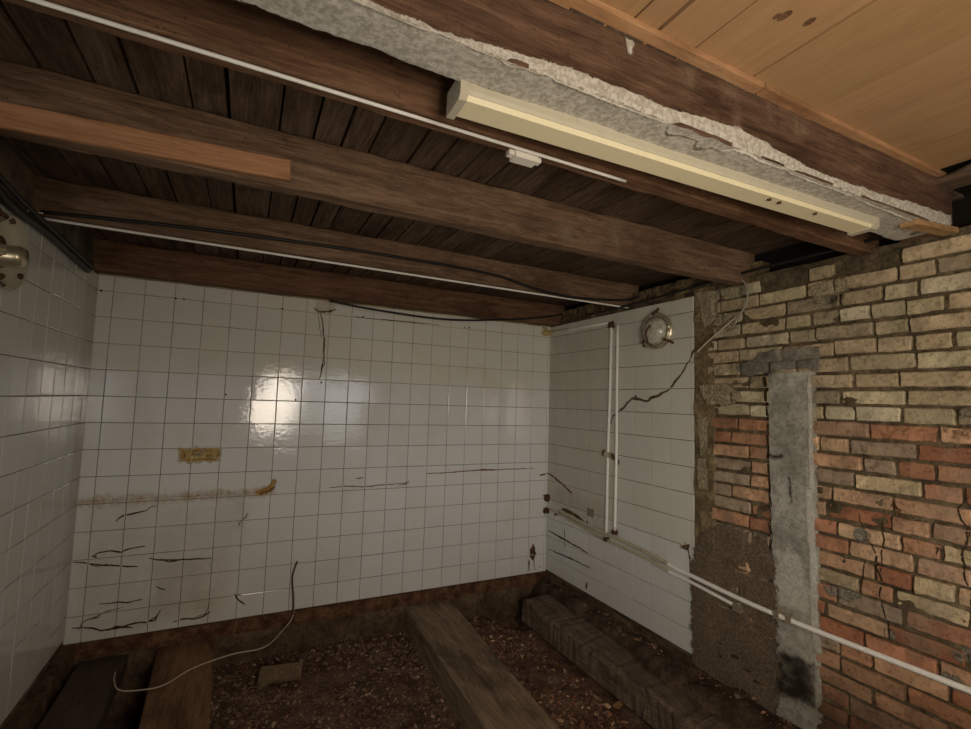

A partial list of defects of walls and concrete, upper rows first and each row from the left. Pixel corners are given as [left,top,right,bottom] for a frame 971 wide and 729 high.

peeling [238,0,952,241]
crack [610,347,696,425]
rust [248,479,276,495]
crack [116,506,156,521]
crack [73,546,213,567]
leakage [772,375,823,702]
crack [73,586,210,632]